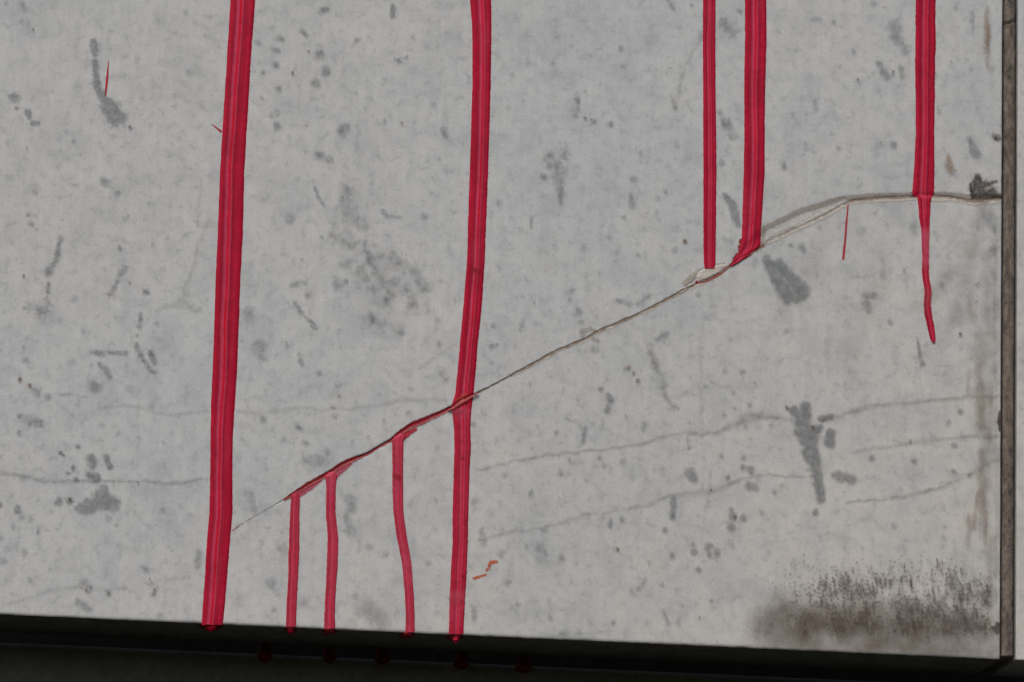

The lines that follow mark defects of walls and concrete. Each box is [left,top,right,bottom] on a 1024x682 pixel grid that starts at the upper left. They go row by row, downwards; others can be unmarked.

crack [478,192,1000,393]
mould [759,559,991,651]